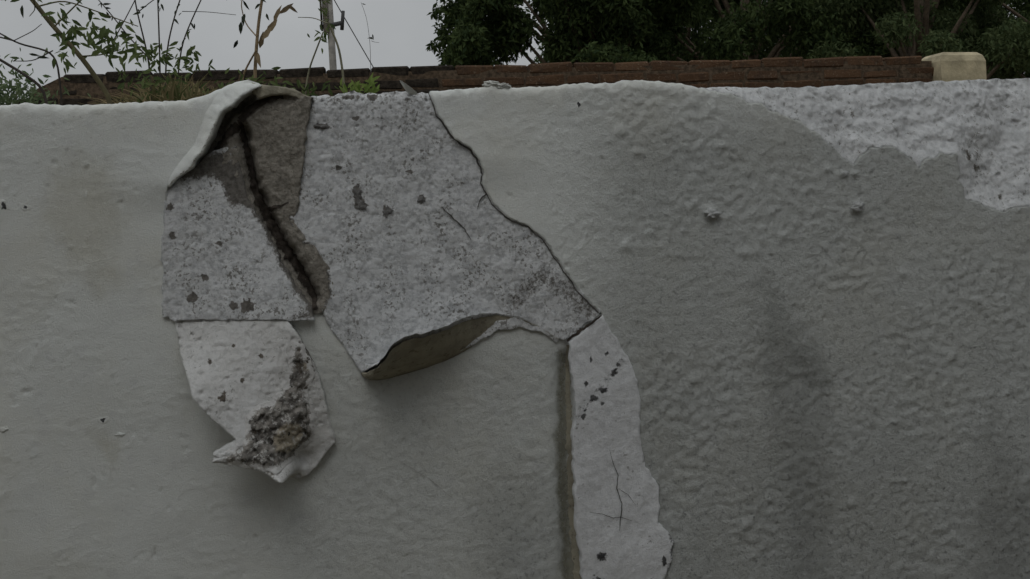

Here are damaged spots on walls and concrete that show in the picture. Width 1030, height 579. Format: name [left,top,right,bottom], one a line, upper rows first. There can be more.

flaking render [160,78,336,483]
crack [213,95,318,310]
spalling [704,78,1030,212]
flaking render [568,315,674,579]